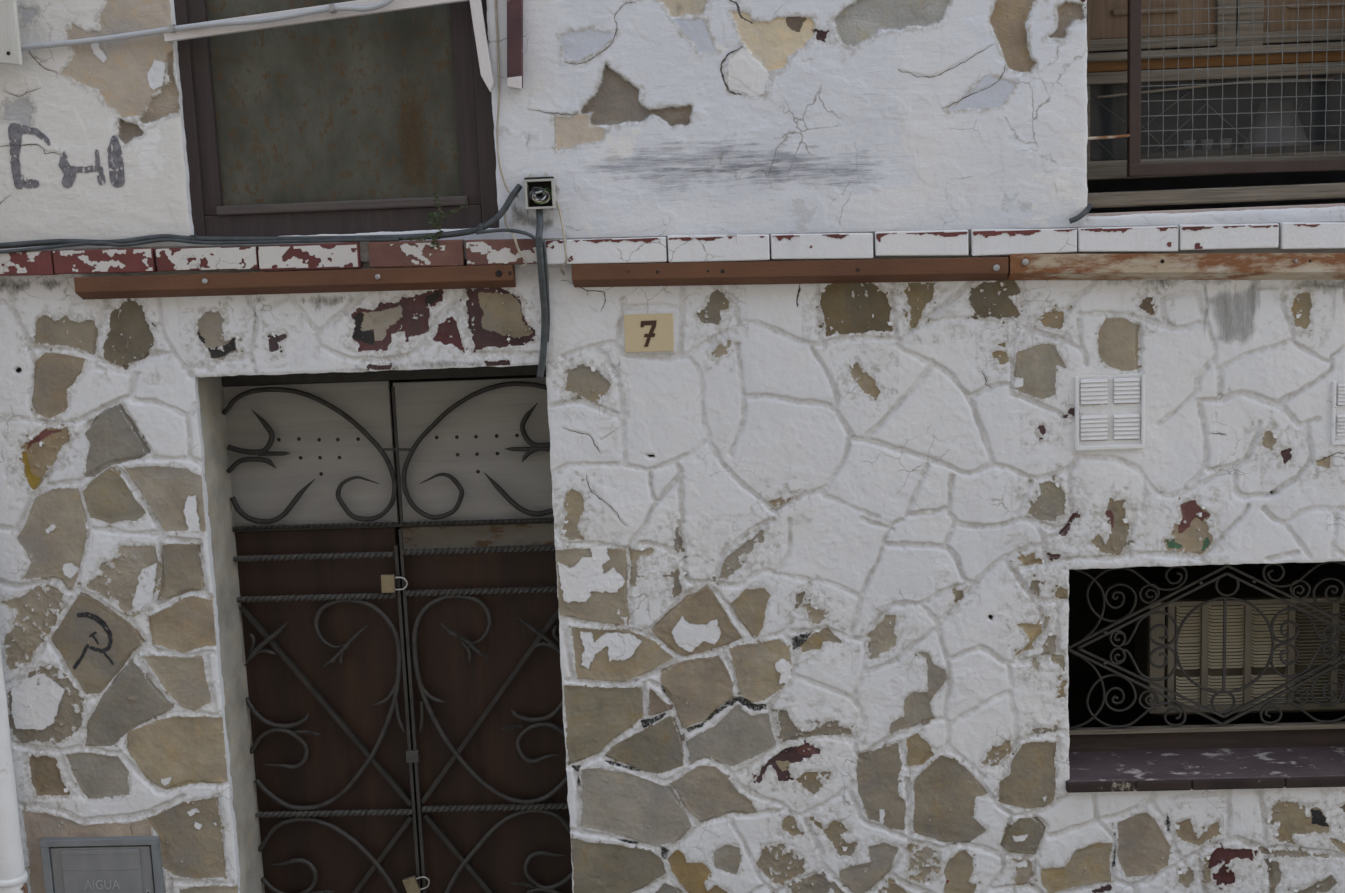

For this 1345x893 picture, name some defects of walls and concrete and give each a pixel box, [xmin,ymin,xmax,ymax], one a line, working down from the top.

peeling [61,0,180,144]
spalling [554,29,692,150]
peeling [660,0,707,17]
spalling [728,0,951,96]
spalling [949,0,1036,111]
spalling [1049,0,1086,39]
peeling [0,245,358,274]
peeling [390,243,445,265]
peeling [351,288,535,370]
peeling [1316,457,1333,468]
peeling [1,298,243,893]
peeling [556,475,1345,893]